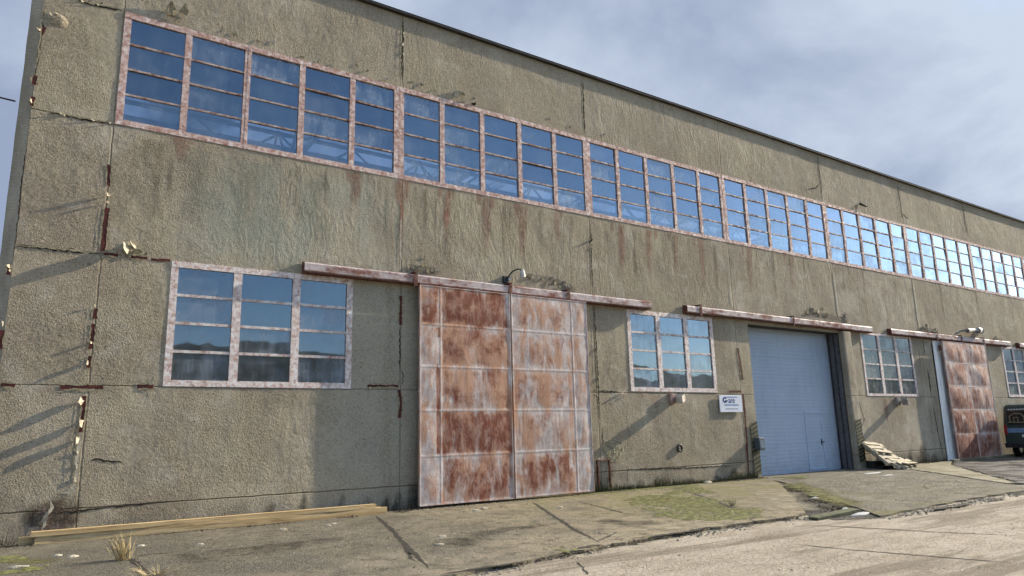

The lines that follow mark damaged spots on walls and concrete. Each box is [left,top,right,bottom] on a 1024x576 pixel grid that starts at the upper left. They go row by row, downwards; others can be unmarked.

crack [56,429,170,514]